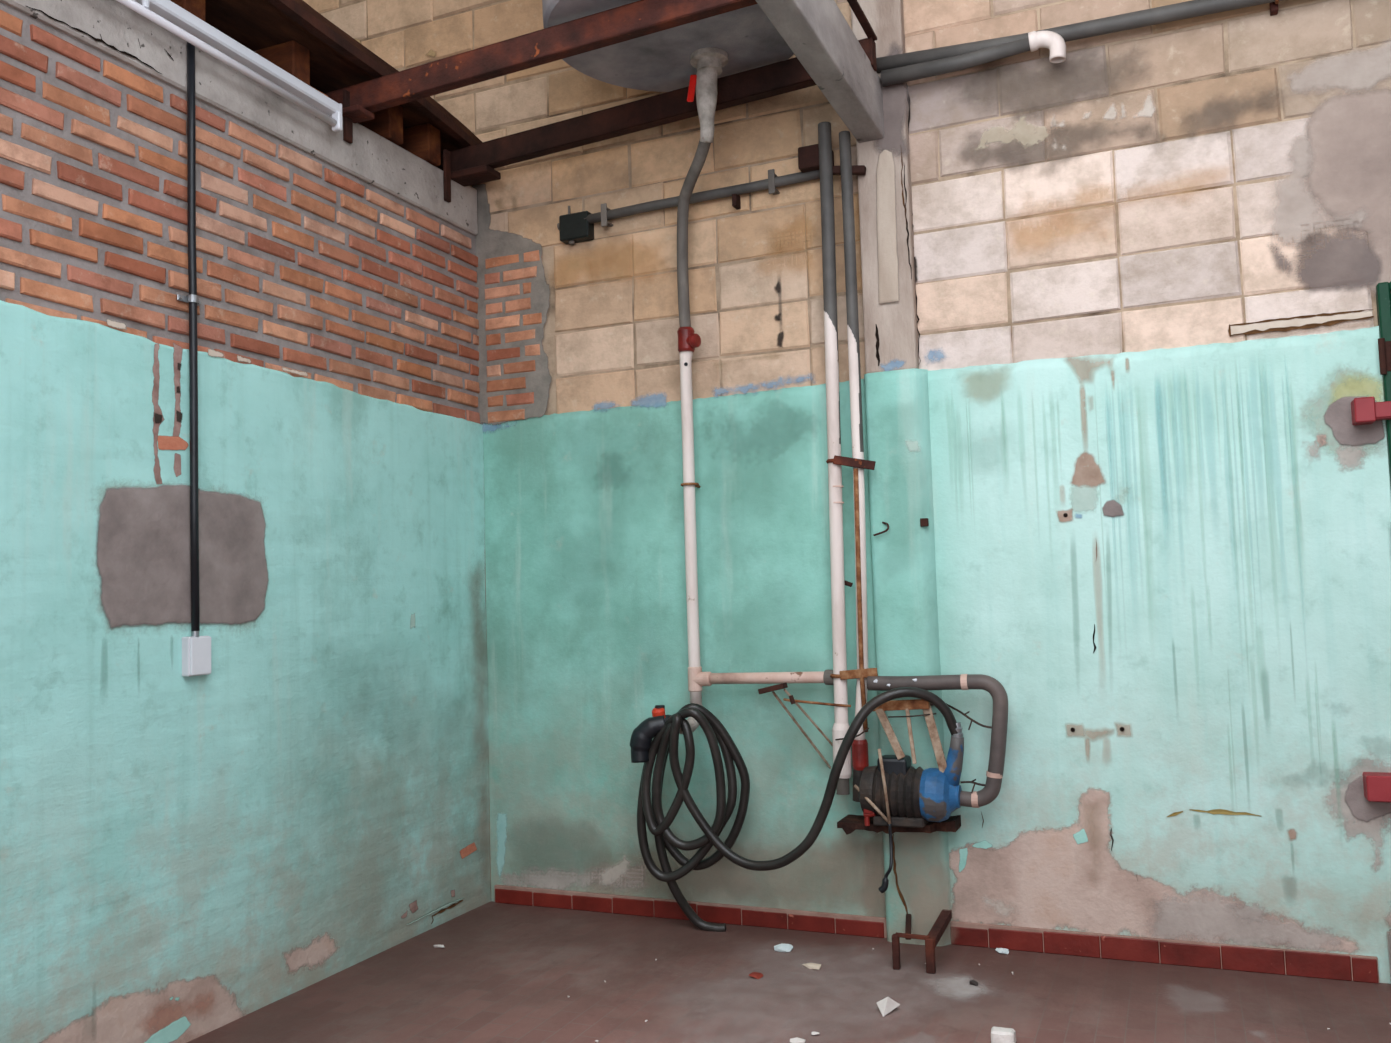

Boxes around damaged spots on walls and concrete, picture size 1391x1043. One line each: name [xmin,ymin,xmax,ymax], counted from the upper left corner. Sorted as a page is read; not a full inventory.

crack [26,6,174,74]
water stain [964,59,1154,164]
flaking render [157,436,189,450]
peeling [949,789,1358,954]
peeling [1345,816,1383,868]
peeling [284,932,337,972]
peeling [41,975,246,1043]